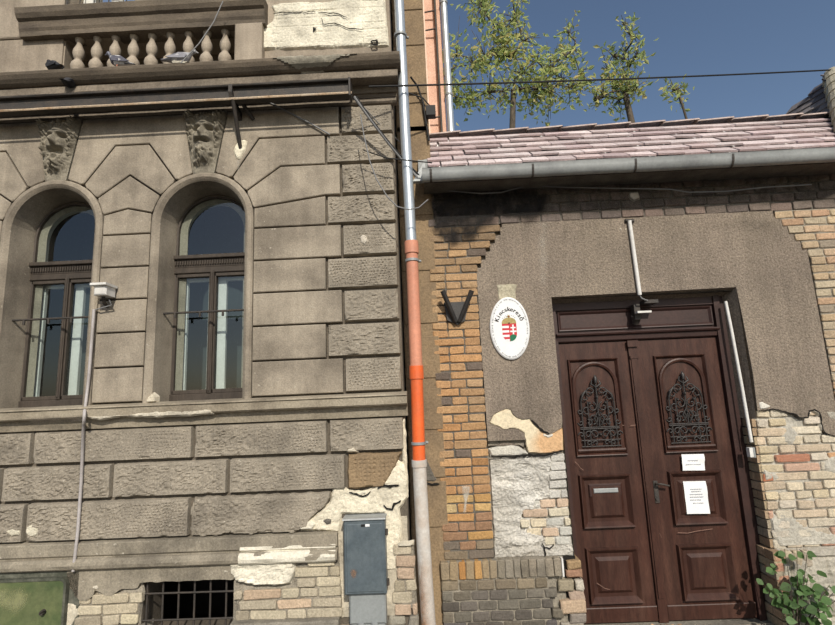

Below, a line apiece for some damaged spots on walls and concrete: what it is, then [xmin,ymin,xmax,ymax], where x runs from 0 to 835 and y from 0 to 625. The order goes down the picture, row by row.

flaking render [66,584,145,625]
flaking render [230,559,343,620]
flaking render [300,418,419,625]
flaking render [488,408,586,625]
flaking render [742,402,835,625]